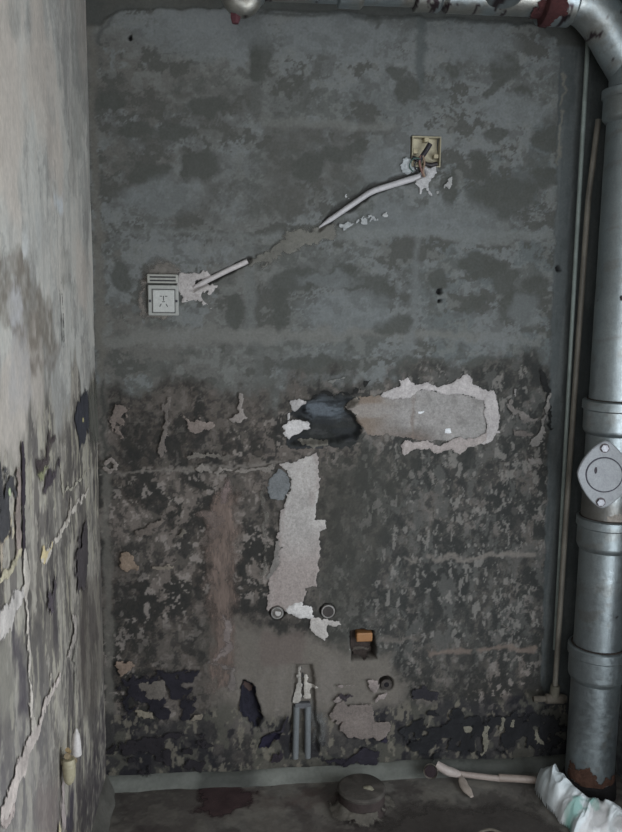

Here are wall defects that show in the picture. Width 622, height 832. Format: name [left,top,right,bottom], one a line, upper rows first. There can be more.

rust [529,0,569,28]
flaking render [109,404,130,439]
flaking render [158,397,171,457]
flaking render [183,369,553,641]
spalling [349,628,373,660]
flaking render [293,666,391,743]
leakage [399,685,568,760]
leakage [325,747,380,767]
rust [567,760,615,789]